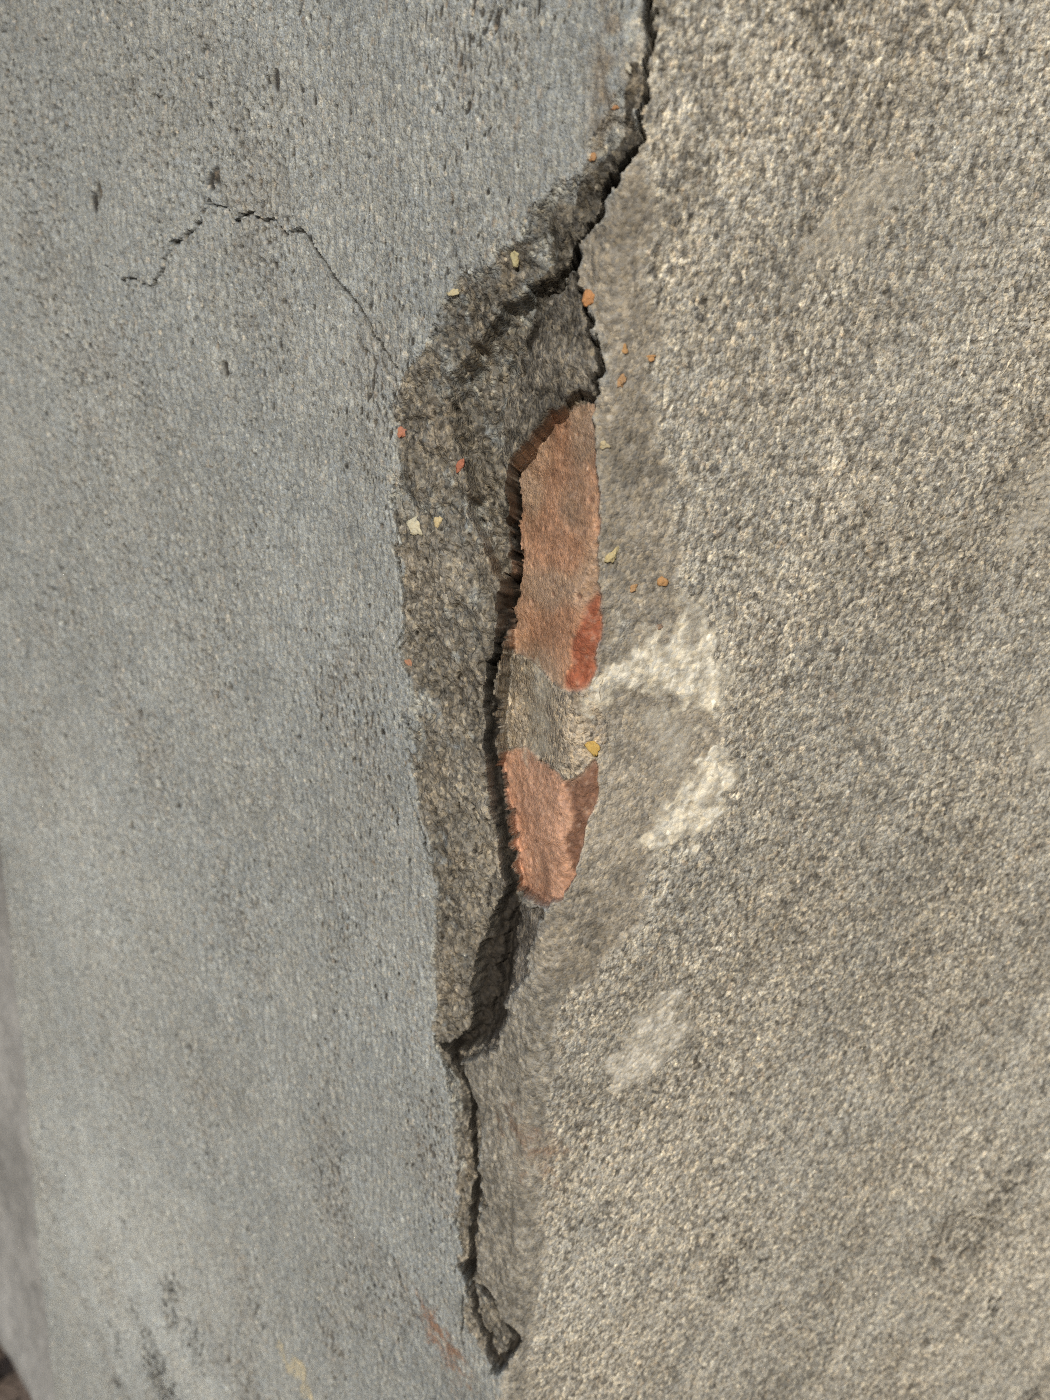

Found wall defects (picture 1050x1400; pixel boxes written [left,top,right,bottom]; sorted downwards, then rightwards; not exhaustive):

crack [103,197,400,371]
crack [528,0,659,399]
crack [392,496,407,648]
spalling [389,61,737,1363]
crack [407,775,434,859]
crack [438,463,525,1376]
crack [393,1256,427,1334]